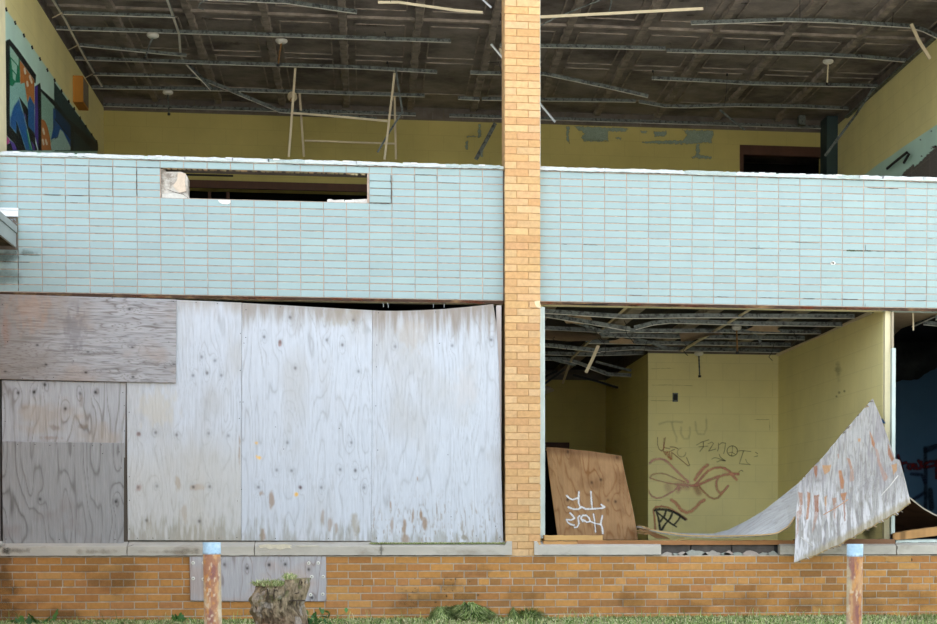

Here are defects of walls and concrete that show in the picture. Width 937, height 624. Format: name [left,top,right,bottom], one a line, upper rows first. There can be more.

peeling [566,126,628,142]
peeling [641,130,713,159]
peeling [1,151,500,193]
peeling [540,146,937,181]